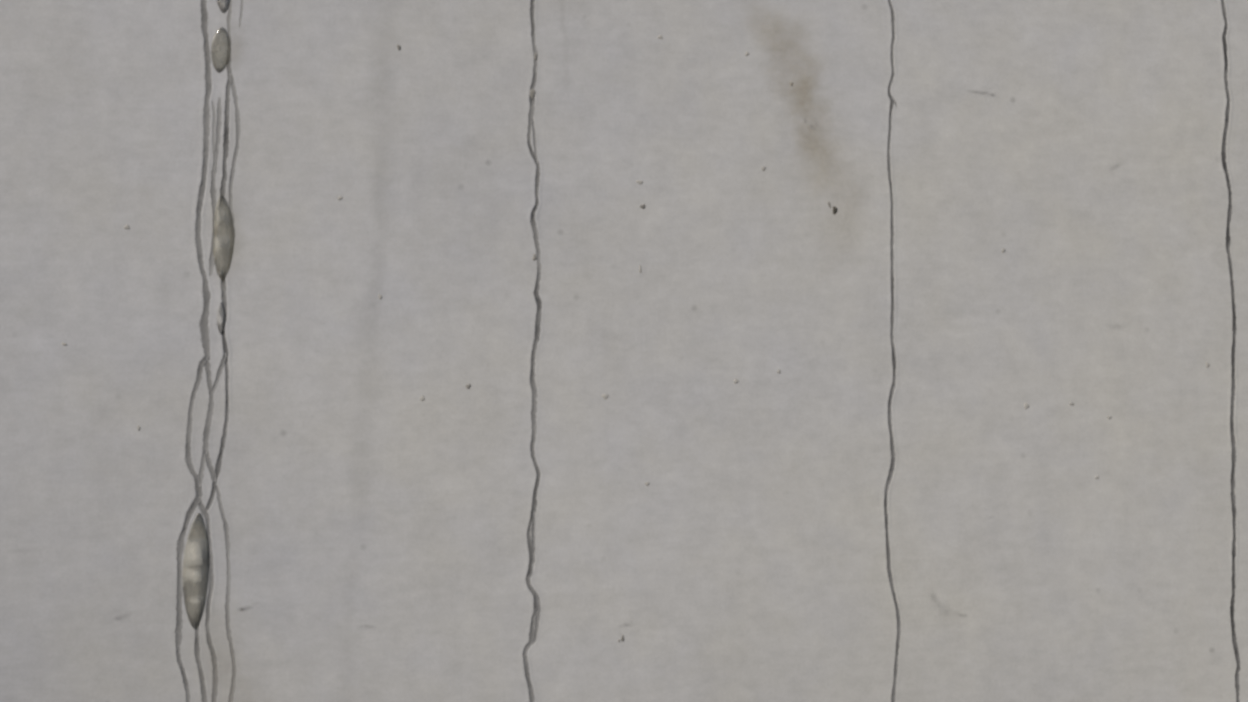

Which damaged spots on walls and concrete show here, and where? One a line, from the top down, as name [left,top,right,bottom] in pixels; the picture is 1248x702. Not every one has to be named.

crack [174,0,243,702]
crack [522,0,542,702]
crack [884,0,901,702]
crack [1221,0,1241,702]